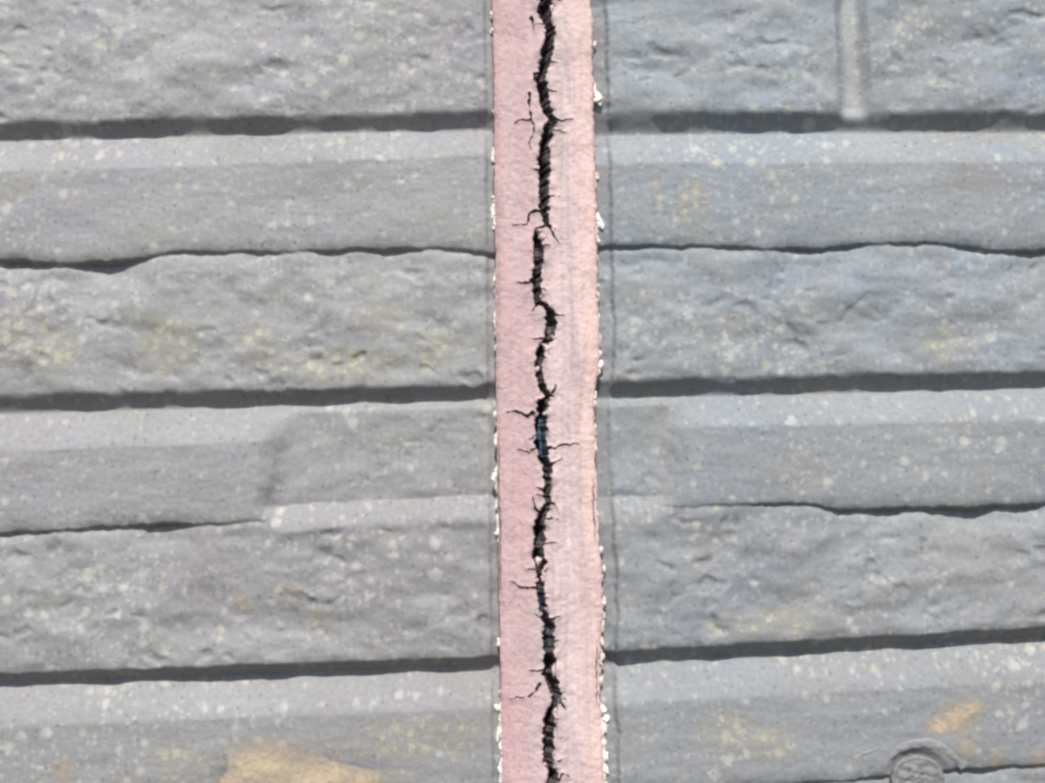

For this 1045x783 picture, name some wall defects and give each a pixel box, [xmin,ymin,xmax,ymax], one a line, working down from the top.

crack [497,0,579,783]
crack [590,482,598,544]
crack [592,645,600,702]